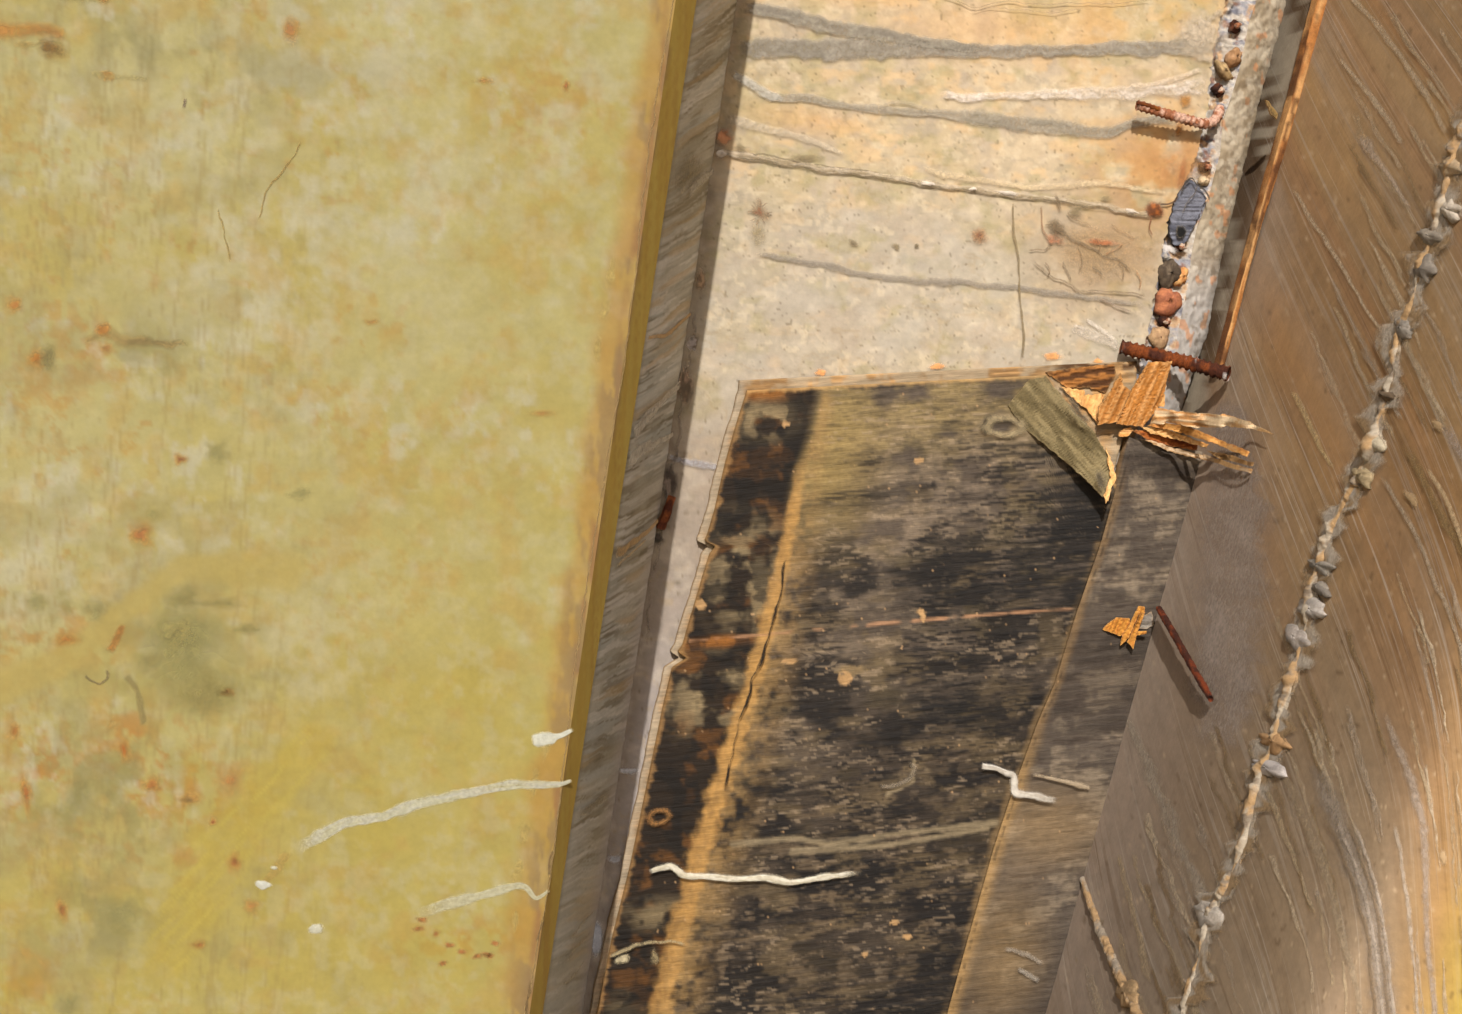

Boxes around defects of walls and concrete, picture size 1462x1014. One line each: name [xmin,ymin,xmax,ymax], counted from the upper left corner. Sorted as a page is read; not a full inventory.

leakage [734,3,1221,138]
corrosion [1146,155,1186,235]
spalling [1115,0,1257,470]
crack [725,562,785,785]
leakage [1112,720,1218,1014]